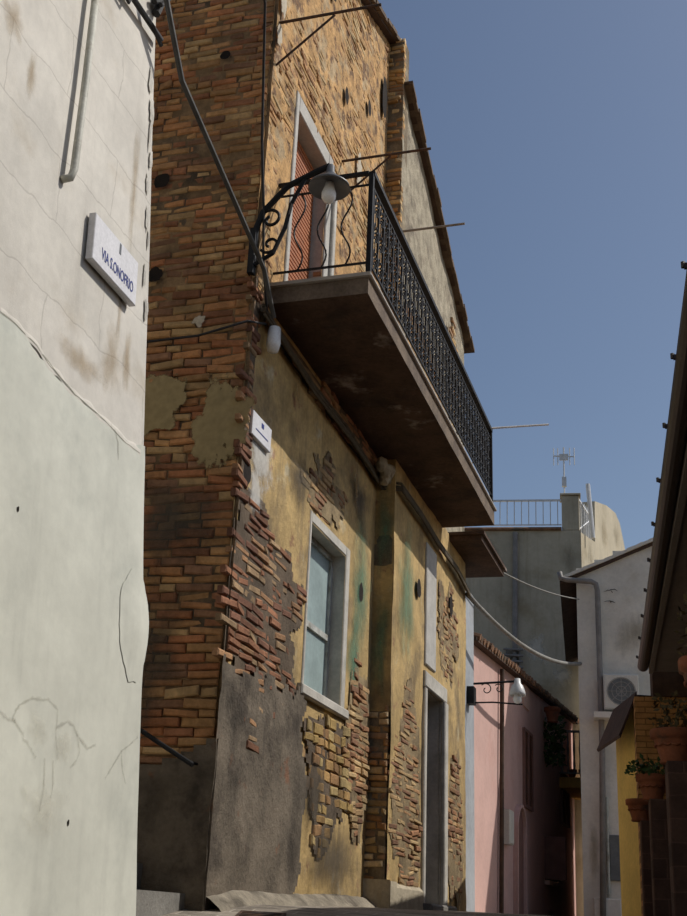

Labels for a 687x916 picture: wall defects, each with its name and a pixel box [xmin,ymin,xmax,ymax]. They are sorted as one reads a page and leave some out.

spalling [281,331,396,486]
spalling [212,275,307,700]
spalling [301,451,348,529]
spalling [436,580,459,690]
spalling [244,718,259,754]
spalling [302,652,372,860]
spalling [384,678,423,888]